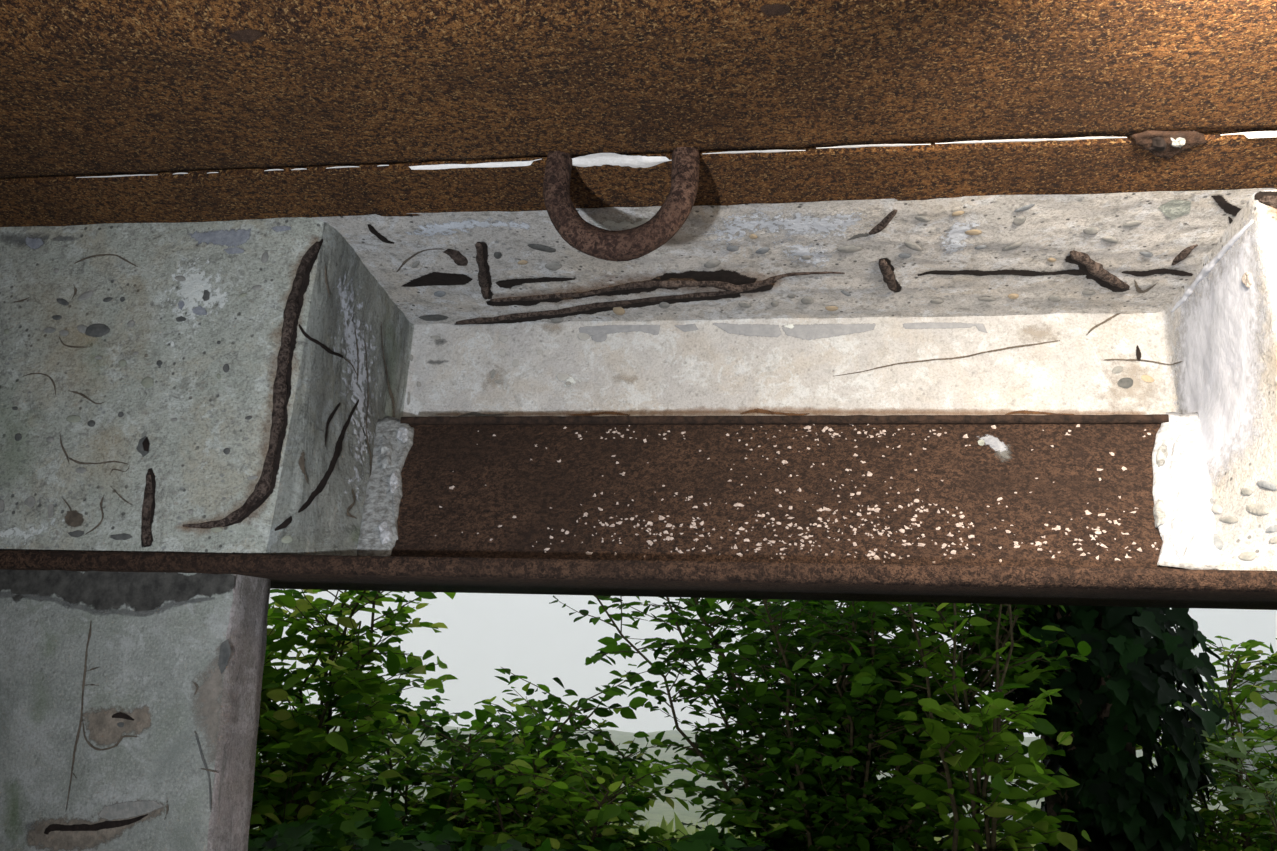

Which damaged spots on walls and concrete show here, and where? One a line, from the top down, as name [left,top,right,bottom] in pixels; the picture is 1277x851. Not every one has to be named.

corrosion [760,3,790,16]
corrosion [1130,130,1208,159]
spalling [1211,195,1241,224]
spalling [1254,191,1277,209]
spalling [396,209,897,366]
spalling [879,241,923,293]
spalling [1047,250,1130,296]
spalling [182,239,395,532]
corrosion [563,408,1141,416]
leakage [0,569,235,616]
crack [66,622,98,809]
spalling [27,799,169,851]